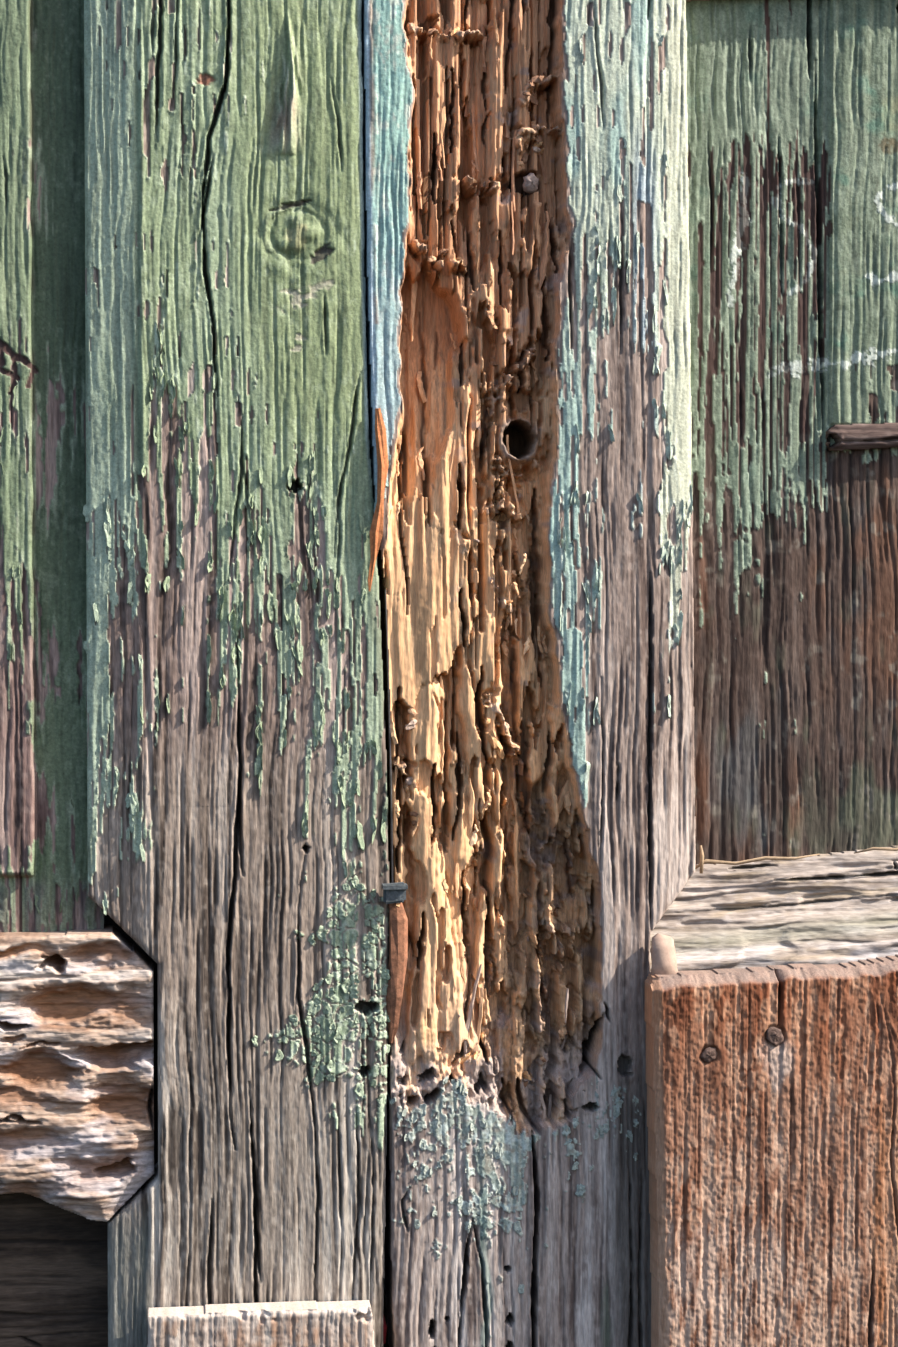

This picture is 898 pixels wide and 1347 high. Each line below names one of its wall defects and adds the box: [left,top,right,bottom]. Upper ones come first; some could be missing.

crack [201,0,231,387]
peeling [825,219,833,240]
peeling [555,0,695,802]
peeling [868,364,898,424]
peeling [0,0,528,1316]
crack [249,1122,261,1303]
peeling [545,1005,646,1222]